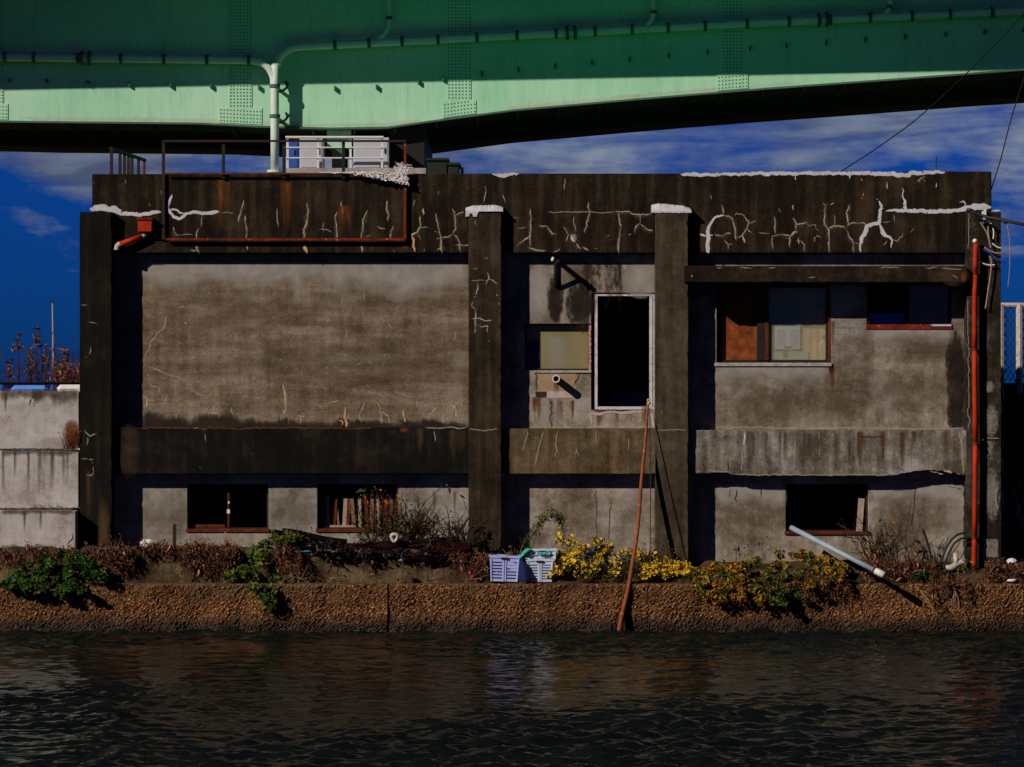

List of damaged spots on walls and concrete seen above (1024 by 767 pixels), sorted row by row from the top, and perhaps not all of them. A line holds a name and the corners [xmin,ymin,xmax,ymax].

crack [90,195,248,252]
crack [519,203,653,252]
crack [700,188,1000,253]